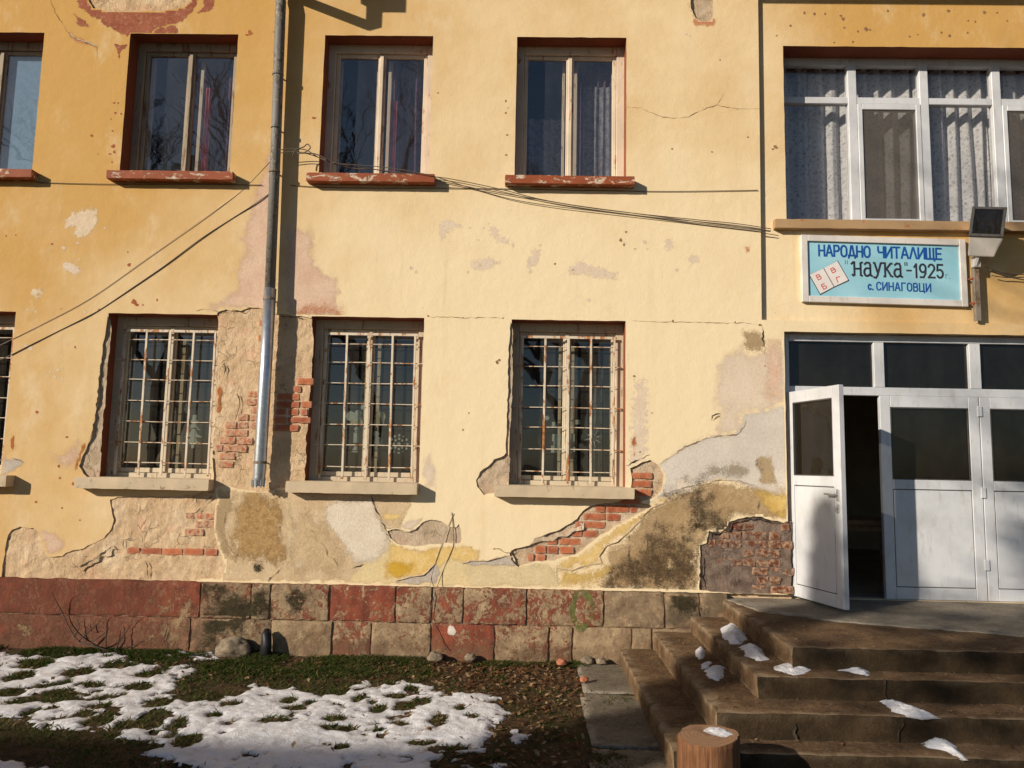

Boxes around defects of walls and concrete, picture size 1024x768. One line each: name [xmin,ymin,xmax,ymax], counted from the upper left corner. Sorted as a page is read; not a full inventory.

spalling [75,0,214,59]
spalling [2,151,348,646]
spalling [476,318,513,495]
spalling [349,375,693,588]
damp [589,454,786,625]
spalling [684,482,795,595]